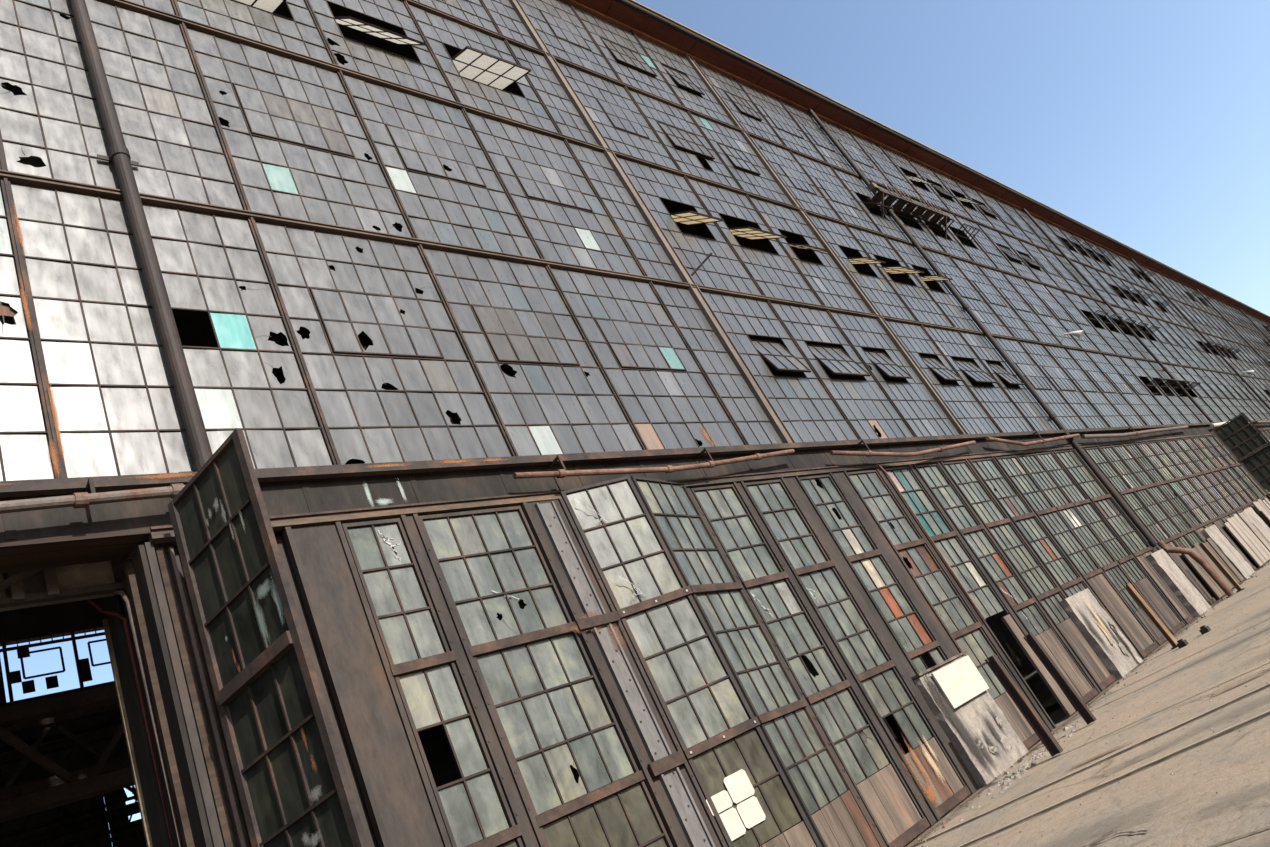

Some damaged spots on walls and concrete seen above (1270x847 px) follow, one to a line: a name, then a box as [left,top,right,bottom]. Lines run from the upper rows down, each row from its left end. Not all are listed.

peeling [254,578,283,643]
corrosion [903,746,936,801]